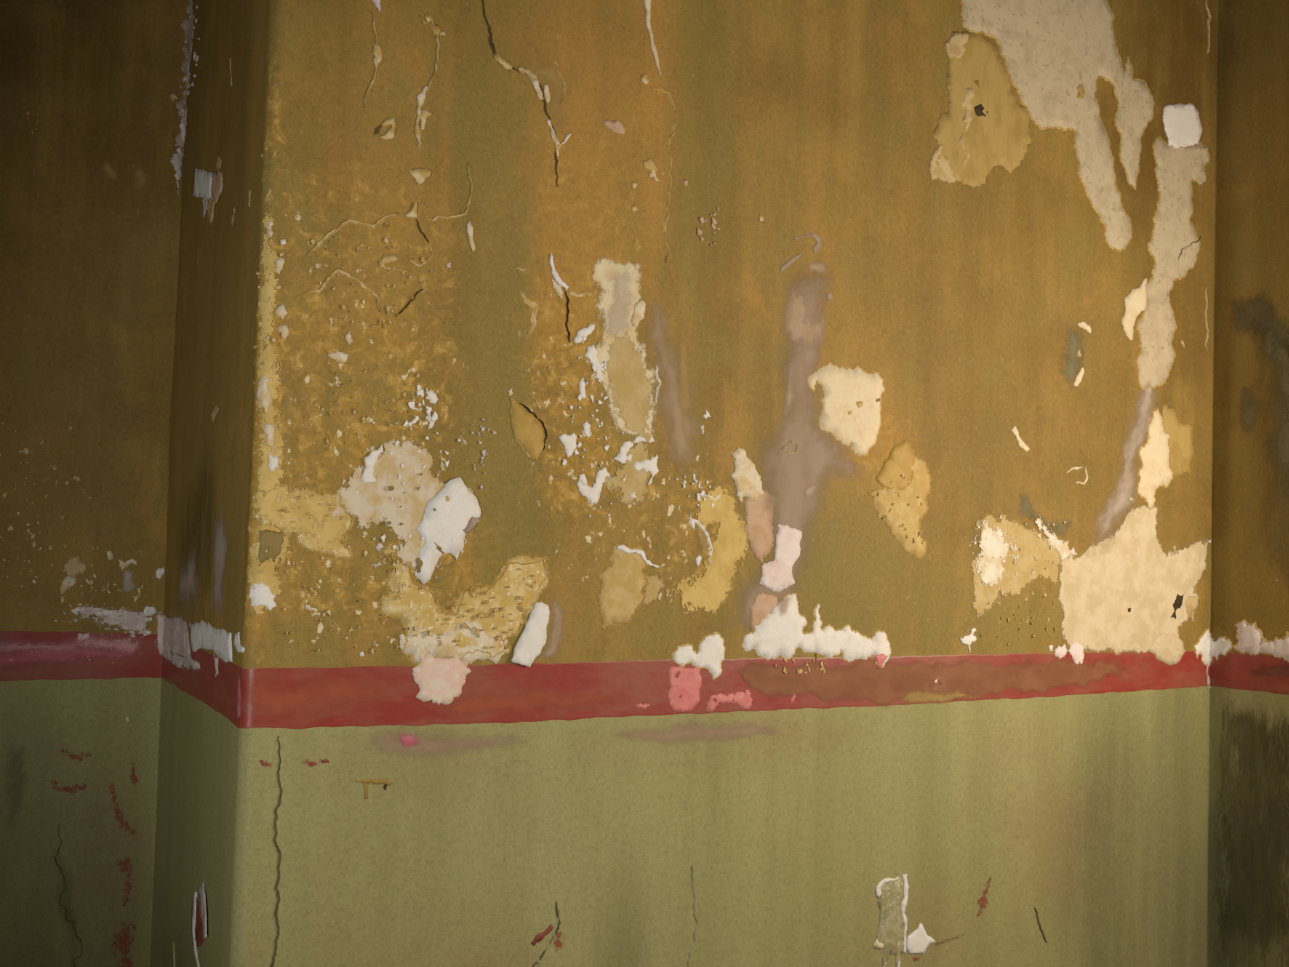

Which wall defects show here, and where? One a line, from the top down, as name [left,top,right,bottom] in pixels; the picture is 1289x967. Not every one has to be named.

crack [482,0,572,187]
spalling [929,0,1210,391]
peeling [0,551,246,676]
spalling [247,162,562,705]
spalling [549,253,661,517]
peeling [808,362,885,457]
spalling [596,404,1289,713]
damp [1233,300,1289,579]
peeling [191,867,207,967]
crack [270,736,282,967]
peeling [873,874,954,967]
damp [1220,712,1289,967]